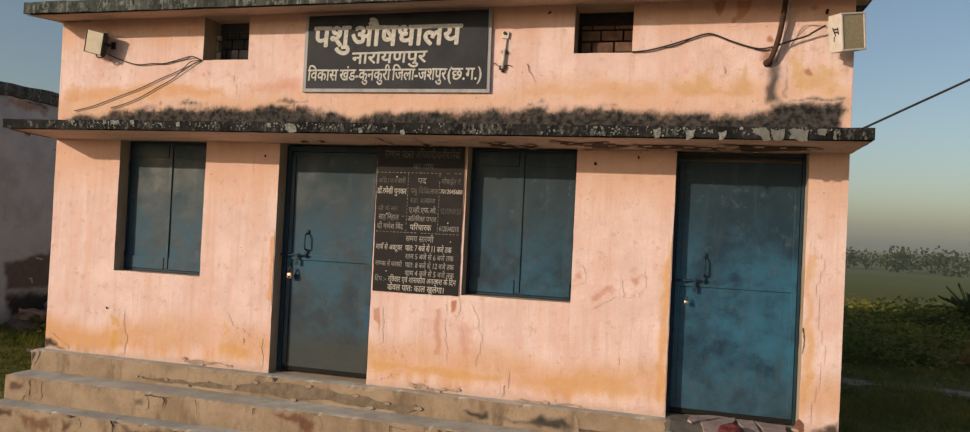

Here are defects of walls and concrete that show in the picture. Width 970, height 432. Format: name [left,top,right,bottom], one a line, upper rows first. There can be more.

leakage [0,26,854,139]
peeling [471,126,841,153]
leakage [32,332,69,365]
leakage [101,308,127,355]
leakage [207,312,263,370]
leakage [367,303,509,391]
leakage [457,234,672,432]